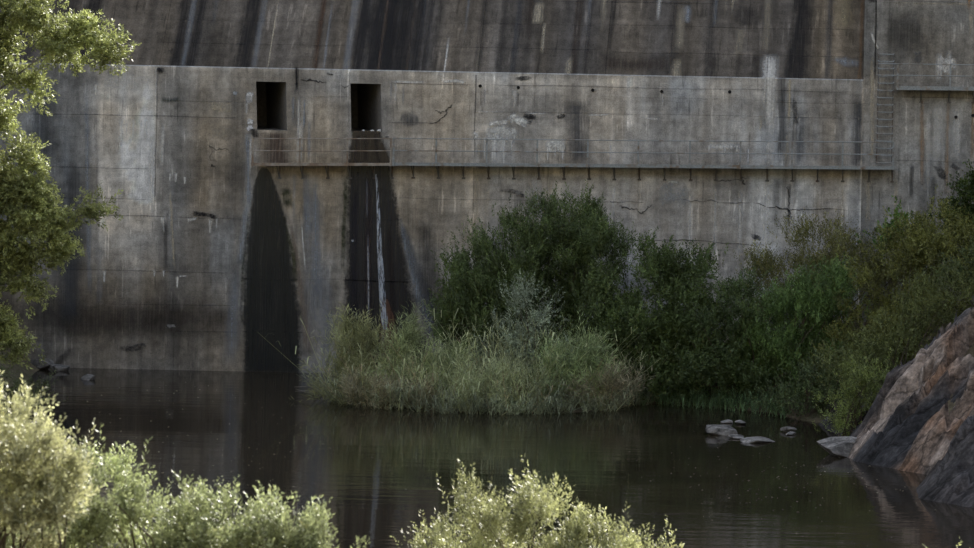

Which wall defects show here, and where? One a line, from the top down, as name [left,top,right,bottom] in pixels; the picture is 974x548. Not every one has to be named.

water stain [157,0,206,73]
water stain [236,0,260,67]
crack [679,177,842,223]
water stain [231,129,319,373]
water stain [341,131,439,375]